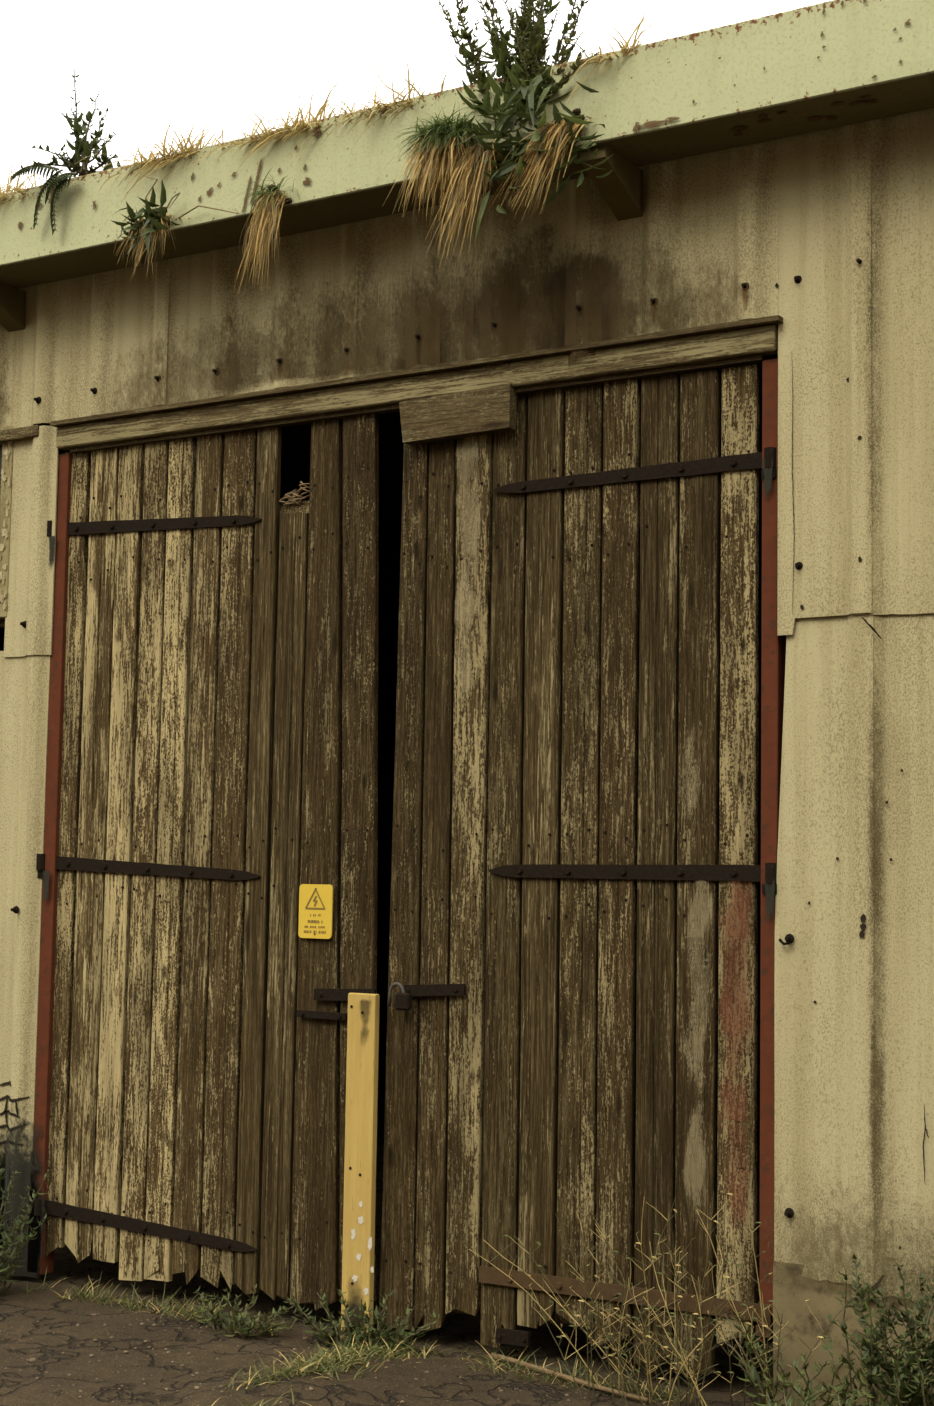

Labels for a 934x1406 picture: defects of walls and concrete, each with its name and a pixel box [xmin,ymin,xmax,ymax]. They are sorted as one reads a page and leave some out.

rust [632,116,679,132]